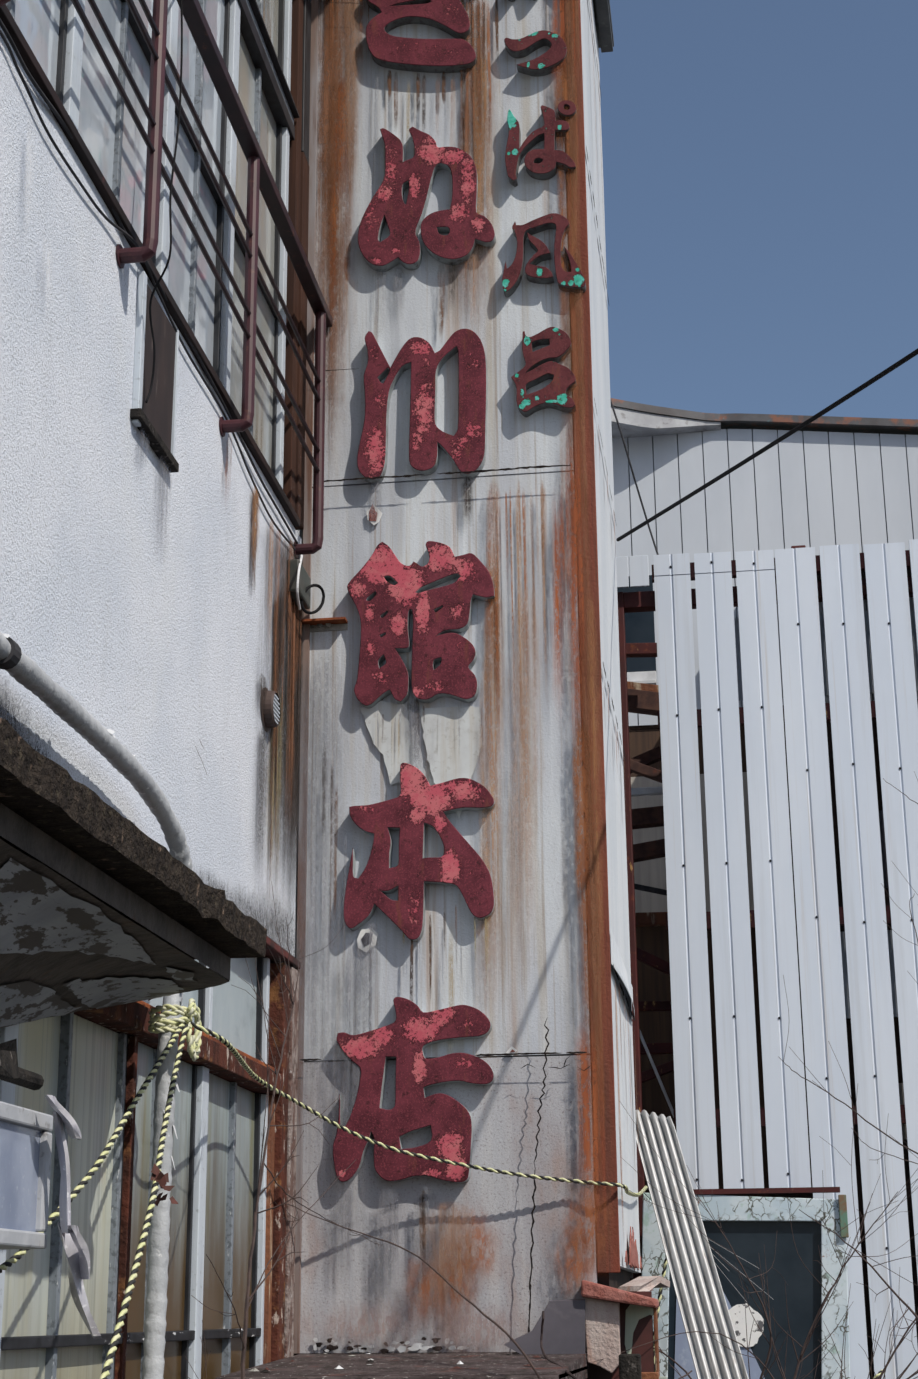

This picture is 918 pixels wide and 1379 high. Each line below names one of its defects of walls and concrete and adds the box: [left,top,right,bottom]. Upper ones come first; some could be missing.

corrosion [318,0,369,374]
corrosion [460,0,499,215]
corrosion [482,0,639,1285]
water stain [200,543,346,1045]
peeling [0,858,198,1027]
water stain [403,906,457,1007]
corrosion [410,1205,494,1314]
crack [474,1017,590,1332]
peeling [625,1226,642,1271]